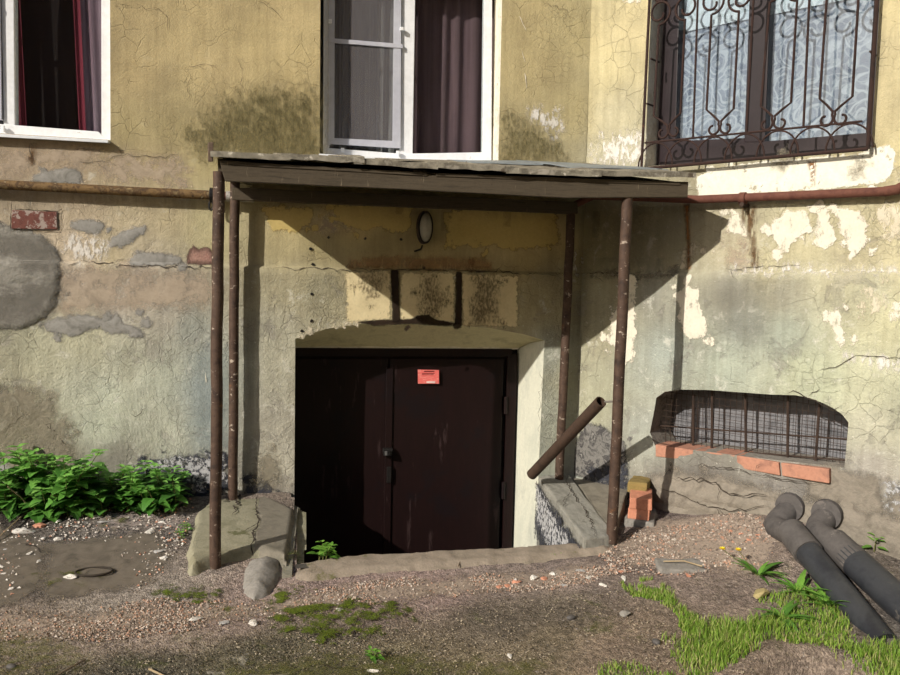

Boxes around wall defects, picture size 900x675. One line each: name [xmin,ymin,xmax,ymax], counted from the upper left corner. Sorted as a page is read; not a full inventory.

damp [206,92,318,153]
flaking render [10,203,60,231]
peeling [719,208,747,238]
peeling [600,241,718,365]
peeling [754,199,900,370]
crack [232,494,260,555]